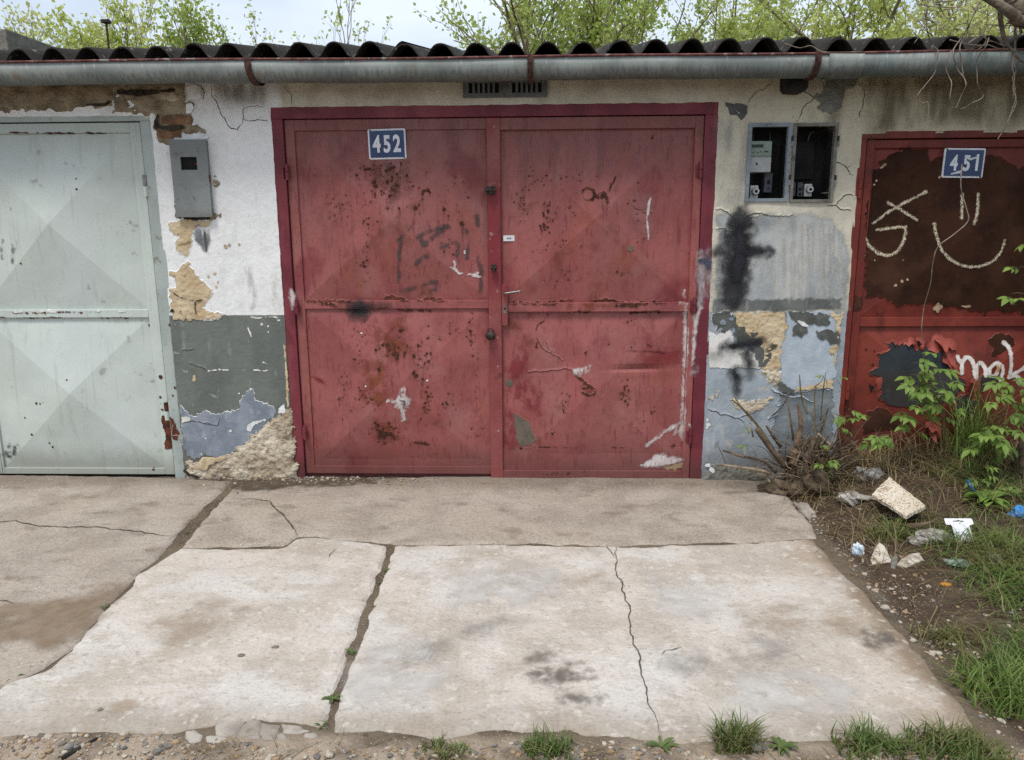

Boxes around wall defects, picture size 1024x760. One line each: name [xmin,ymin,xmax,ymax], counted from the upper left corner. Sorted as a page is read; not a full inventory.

flaking render [0,83,208,146]
crack [201,84,268,130]
corrosion [355,162,431,274]
corrosion [513,166,616,215]
corrosion [159,386,179,449]
flaking render [180,345,299,480]
corrosion [338,318,478,444]
peeling [708,310,844,457]
peeling [862,334,999,434]
crack [0,520,172,536]
crack [247,498,298,535]
crack [606,545,682,734]